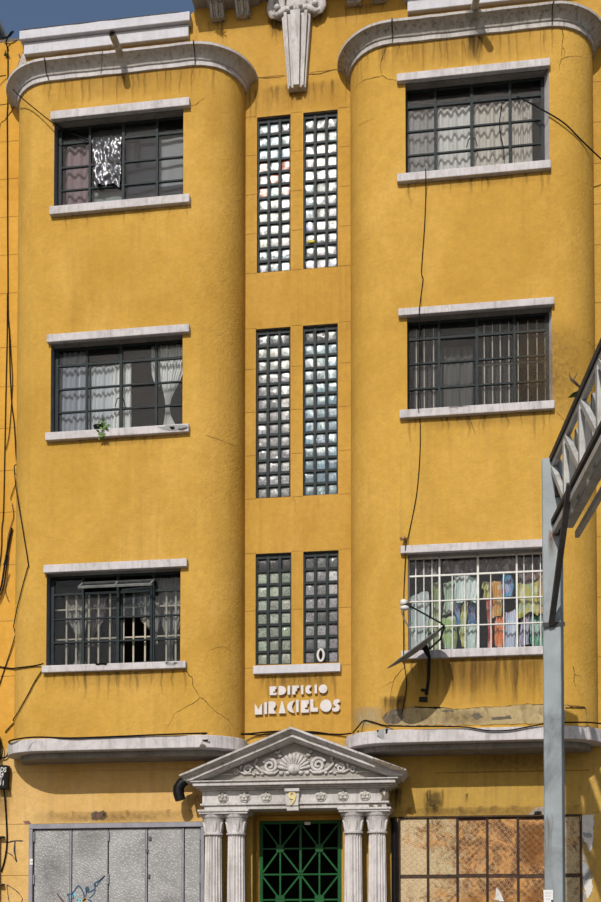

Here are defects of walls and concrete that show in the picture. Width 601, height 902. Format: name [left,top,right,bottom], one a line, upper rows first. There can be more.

peeling [580,814,595,902]